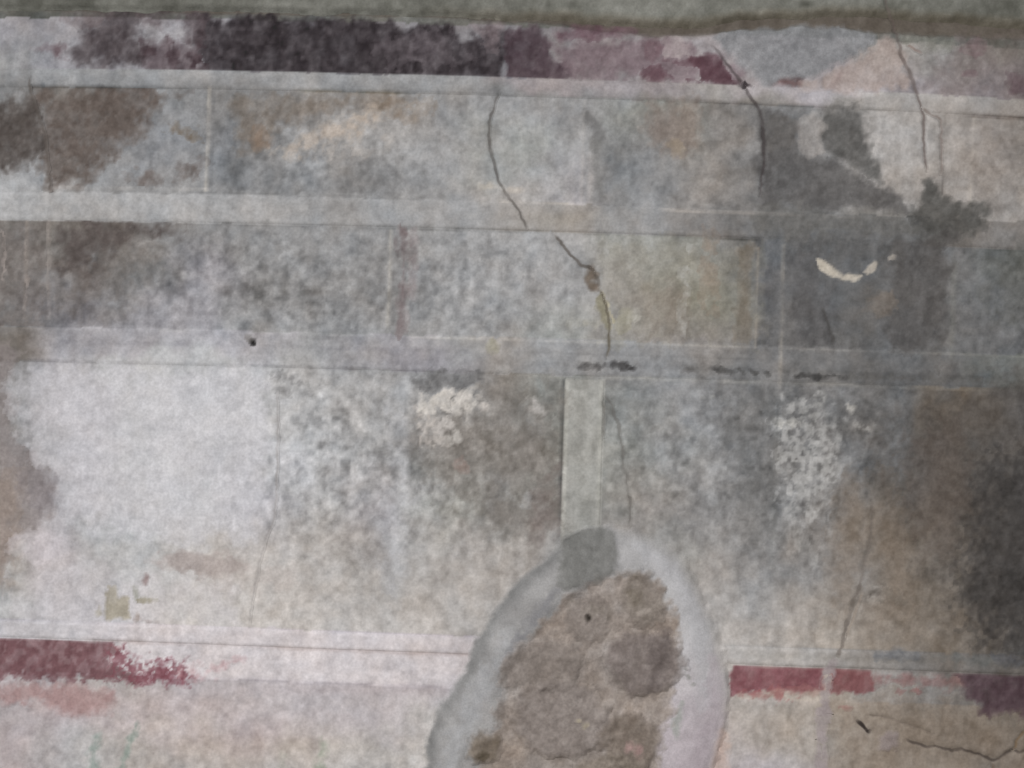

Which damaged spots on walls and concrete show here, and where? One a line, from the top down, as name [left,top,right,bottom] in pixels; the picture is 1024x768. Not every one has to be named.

water stain [370,361,609,611]
crack [486,93,612,359]
crack [711,44,767,197]
water stain [564,99,1024,673]
spalling [815,252,897,283]
crack [883,0,944,175]
flaking render [464,566,691,768]
crack [813,500,1024,768]